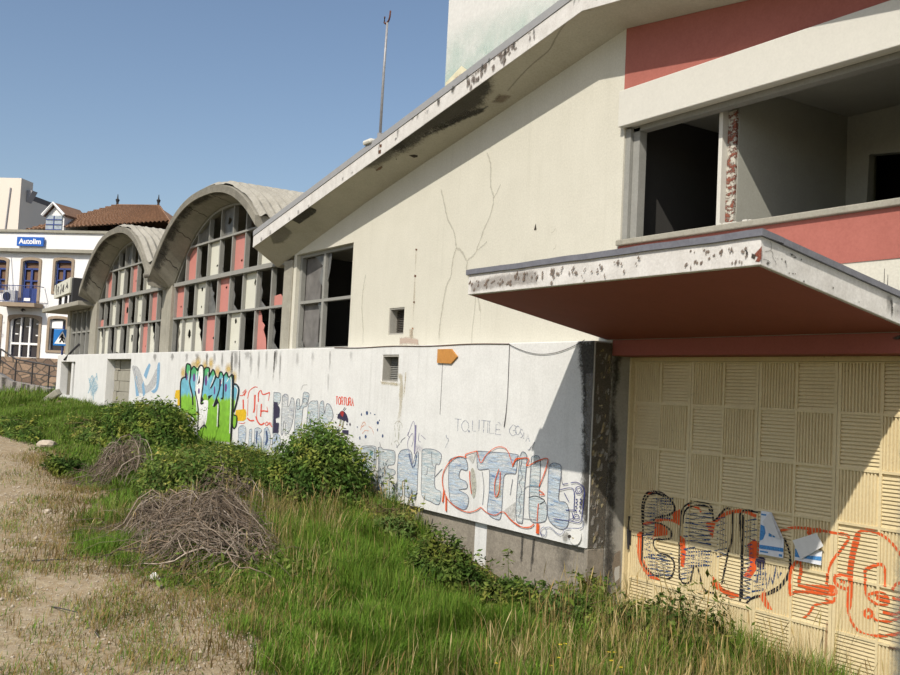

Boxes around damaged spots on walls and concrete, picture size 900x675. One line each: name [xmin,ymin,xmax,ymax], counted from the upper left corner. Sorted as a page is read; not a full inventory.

water stain [366,40,517,167]
spalling [725,110,739,223]
peeling [469,264,605,291]
peeling [684,246,769,269]
water stain [579,341,621,596]
water stain [892,570,900,675]